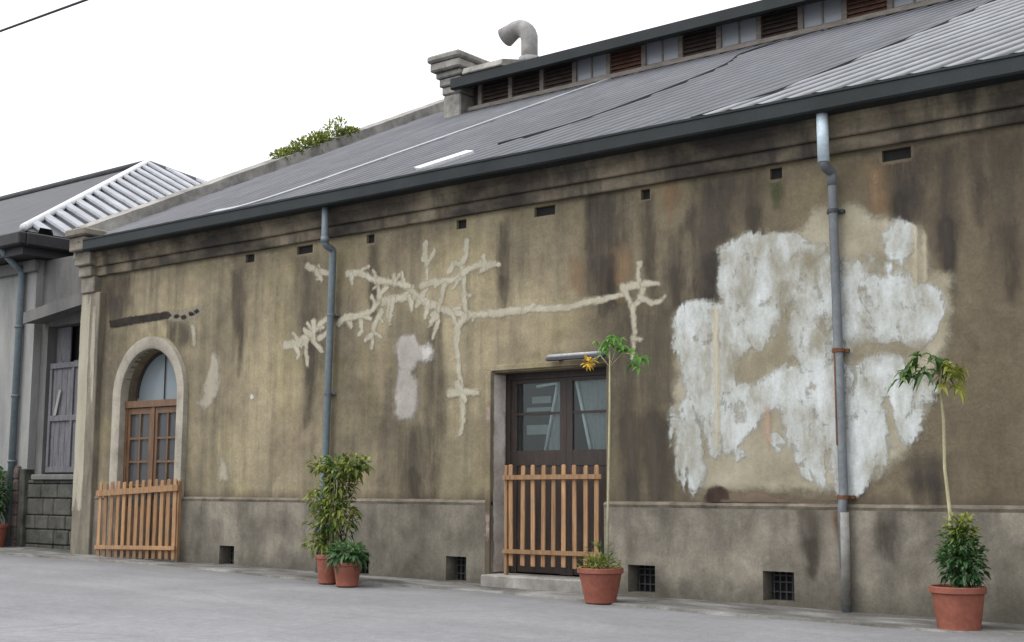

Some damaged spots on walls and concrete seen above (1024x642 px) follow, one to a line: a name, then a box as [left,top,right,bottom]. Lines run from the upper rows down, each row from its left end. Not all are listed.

peeling [421,343,432,361]
crack [282,238,666,436]
peeling [669,201,954,503]